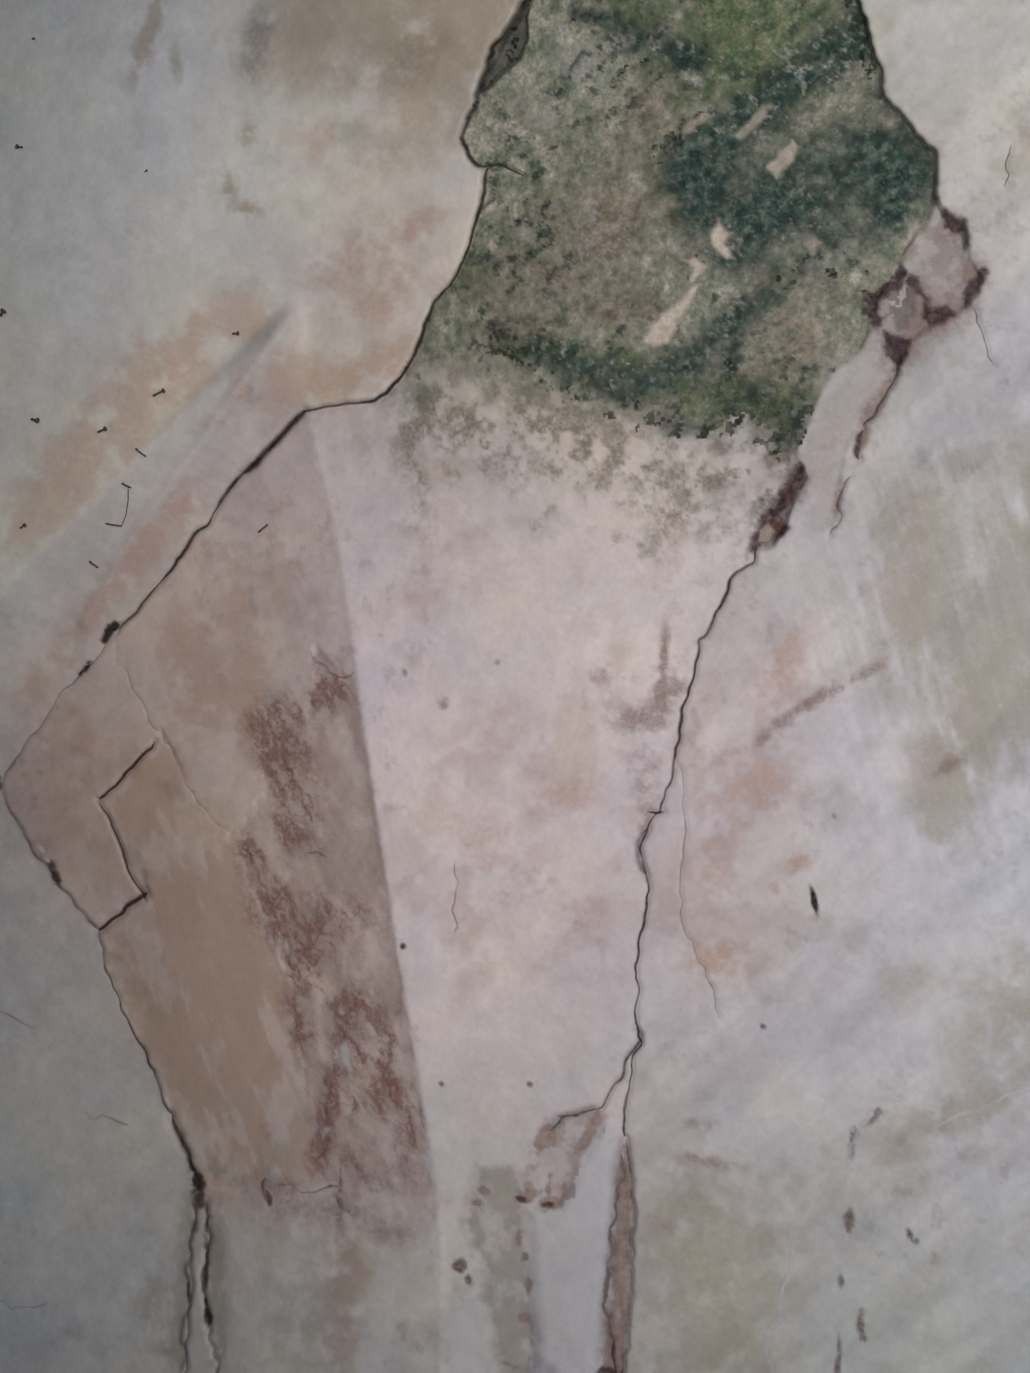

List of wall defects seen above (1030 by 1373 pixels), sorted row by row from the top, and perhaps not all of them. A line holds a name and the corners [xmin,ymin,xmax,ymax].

spalling [462,114,487,167]
spalling [480,0,530,93]
water stain [406,0,937,487]
spalling [854,195,988,460]
crack [36,845,63,890]
crack [98,742,155,930]
peeling [240,653,421,1209]
crack [553,547,757,1373]
crack [105,968,224,1372]
spalling [517,1174,567,1208]
spalling [535,1115,595,1154]